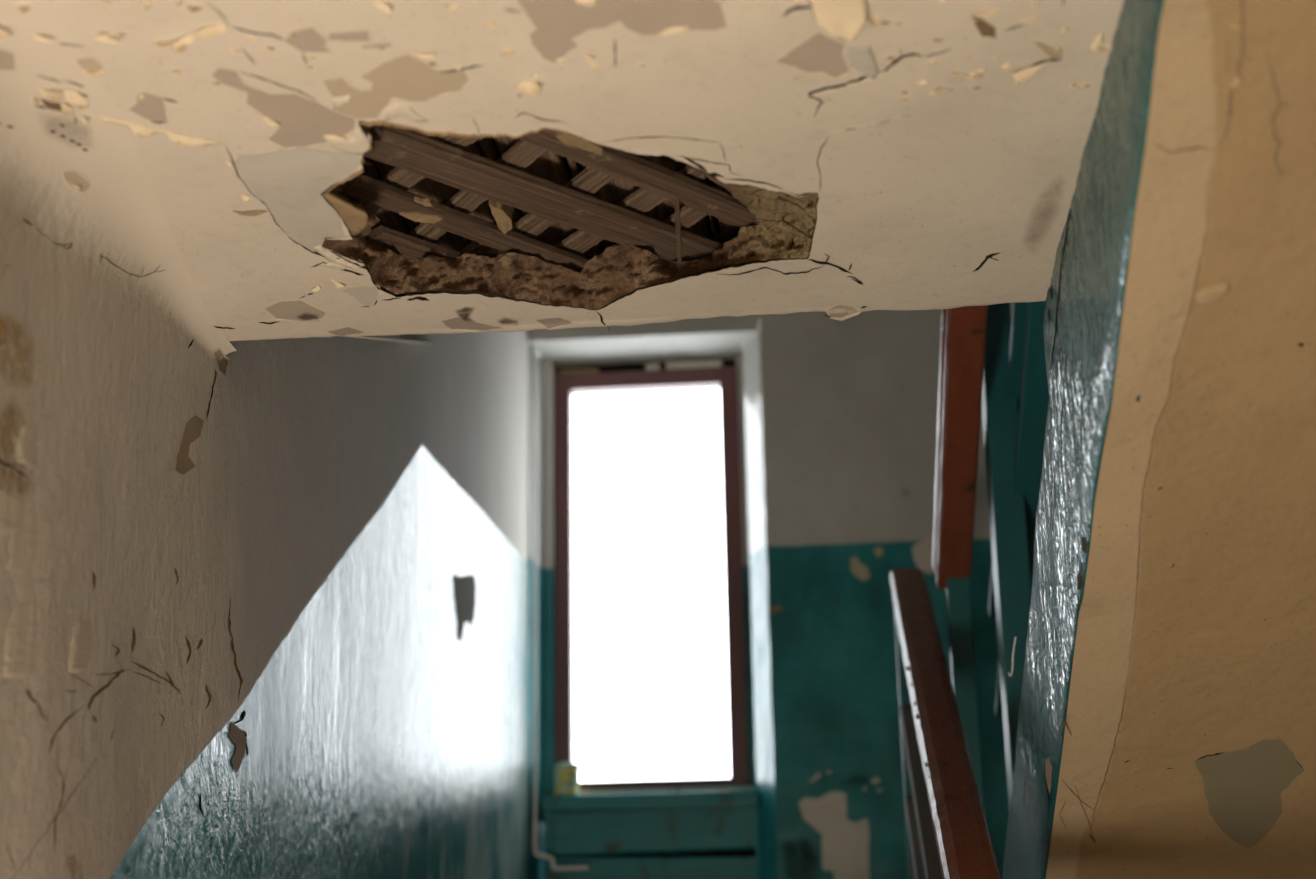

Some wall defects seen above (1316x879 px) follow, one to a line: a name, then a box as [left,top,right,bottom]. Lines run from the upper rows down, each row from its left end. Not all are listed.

peeling [0,26,17,71]
spalling [30,0,819,344]
crack [1051,209,1070,460]
crack [1089,0,1289,844]
crack [6,627,136,879]
crack [185,598,243,708]
peeling [798,770,870,879]
peeling [1194,739,1304,849]